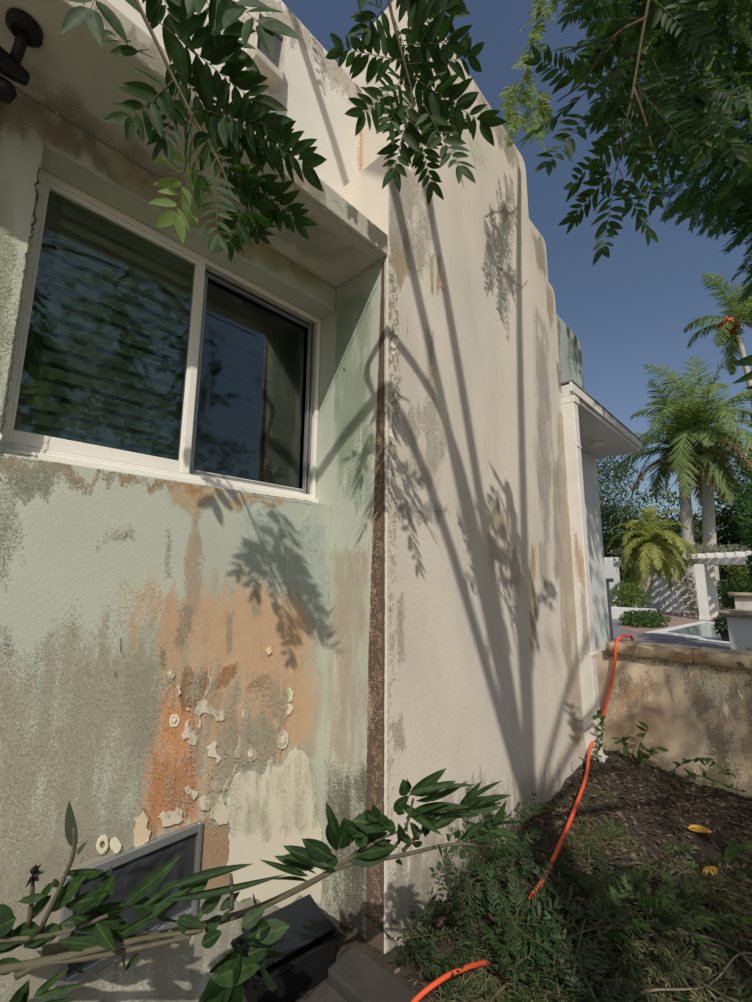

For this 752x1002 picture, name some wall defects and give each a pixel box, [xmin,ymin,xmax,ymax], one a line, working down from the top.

damp [118,162,413,827]
damp [602,654,752,797]
peeling [96,835,122,854]
peeling [133,807,183,847]
peeling [169,688,323,908]
damp [322,840,384,952]